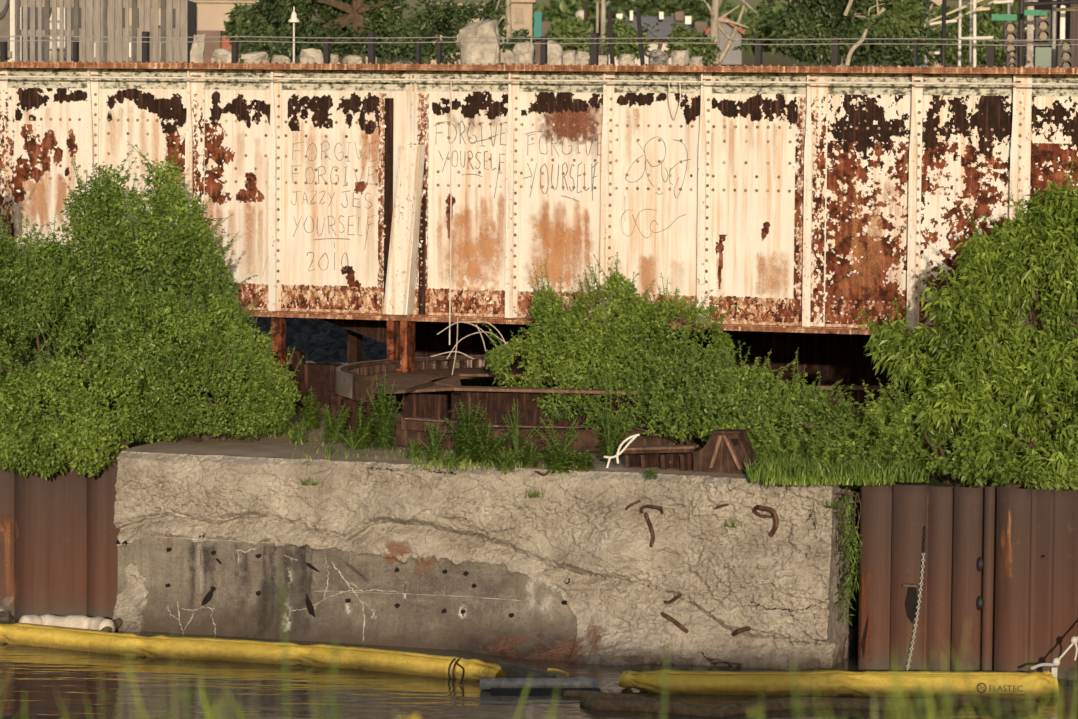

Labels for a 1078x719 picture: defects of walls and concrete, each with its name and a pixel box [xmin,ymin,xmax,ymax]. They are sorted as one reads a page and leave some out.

peeling [106,89,187,134]
peeling [287,92,379,135]
peeling [617,93,798,125]
peeling [828,94,1013,161]
corrosion [0,95,78,246]
corrosion [164,100,264,258]
corrosion [638,97,1011,327]
corrosion [1030,143,1078,211]
crack [134,535,297,563]
spalling [112,451,836,670]
crack [132,565,216,634]
crack [292,557,519,640]